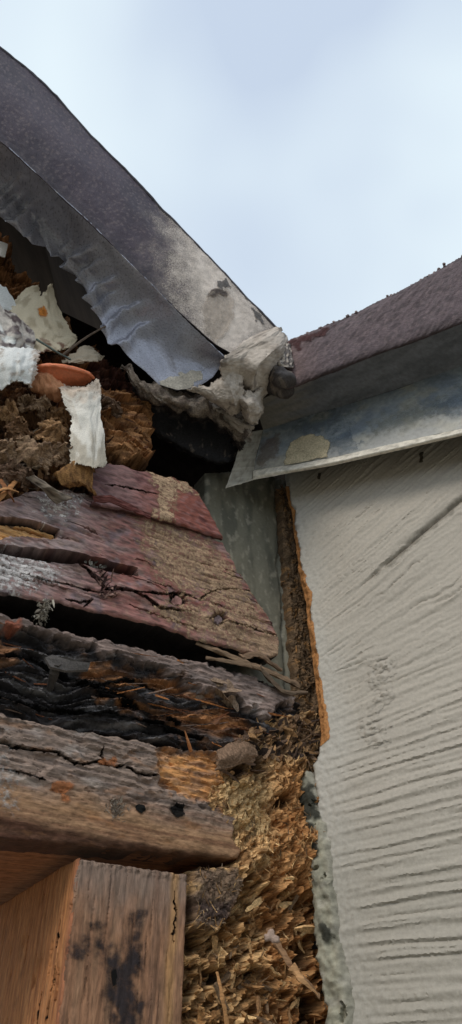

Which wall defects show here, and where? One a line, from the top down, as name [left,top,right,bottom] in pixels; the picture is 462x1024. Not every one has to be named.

peeling [19,410,41,442]
peeling [0,461,64,501]
crack [106,484,158,495]
crack [1,566,272,635]
crack [0,744,157,780]
peeling [181,486,332,1024]
leakage [70,909,147,1024]